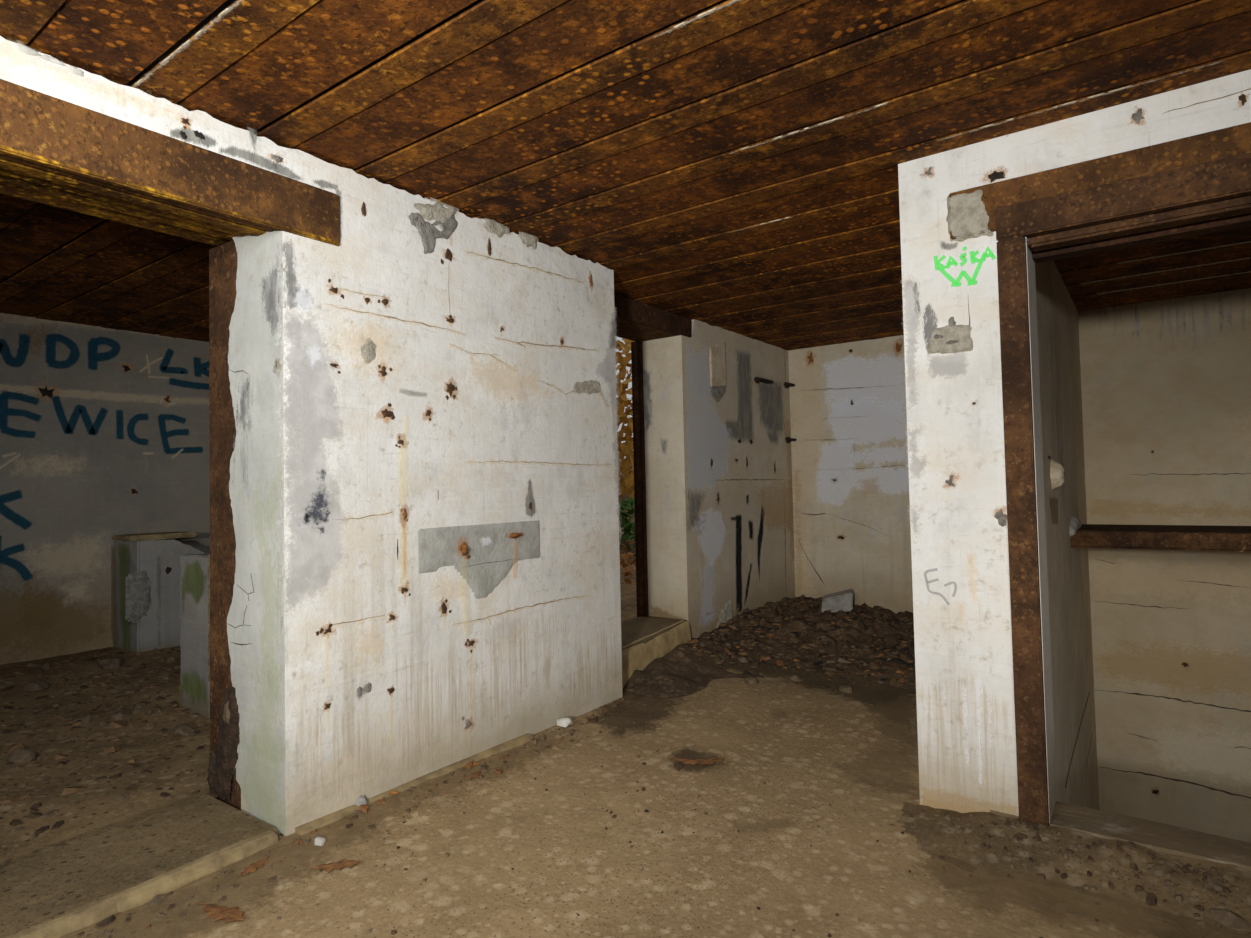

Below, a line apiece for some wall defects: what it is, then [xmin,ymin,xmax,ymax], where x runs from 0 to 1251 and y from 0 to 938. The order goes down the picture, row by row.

corrosion [1131,108,1145,124]
corrosion [988,171,1005,183]
spalling [408,197,459,254]
corrosion [446,382,457,400]
peeling [816,279,973,505]